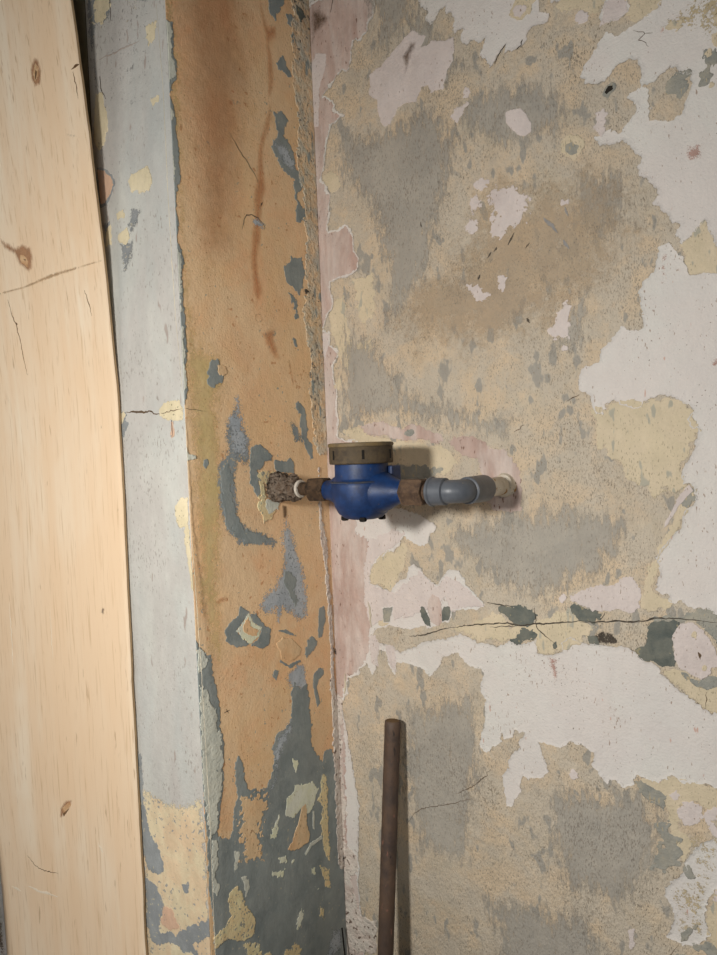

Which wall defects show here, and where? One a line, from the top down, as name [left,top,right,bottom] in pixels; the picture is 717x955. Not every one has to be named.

crack [127,408,201,435]
peeling [87,0,347,955]
peeling [268,0,717,955]
crack [414,602,716,643]